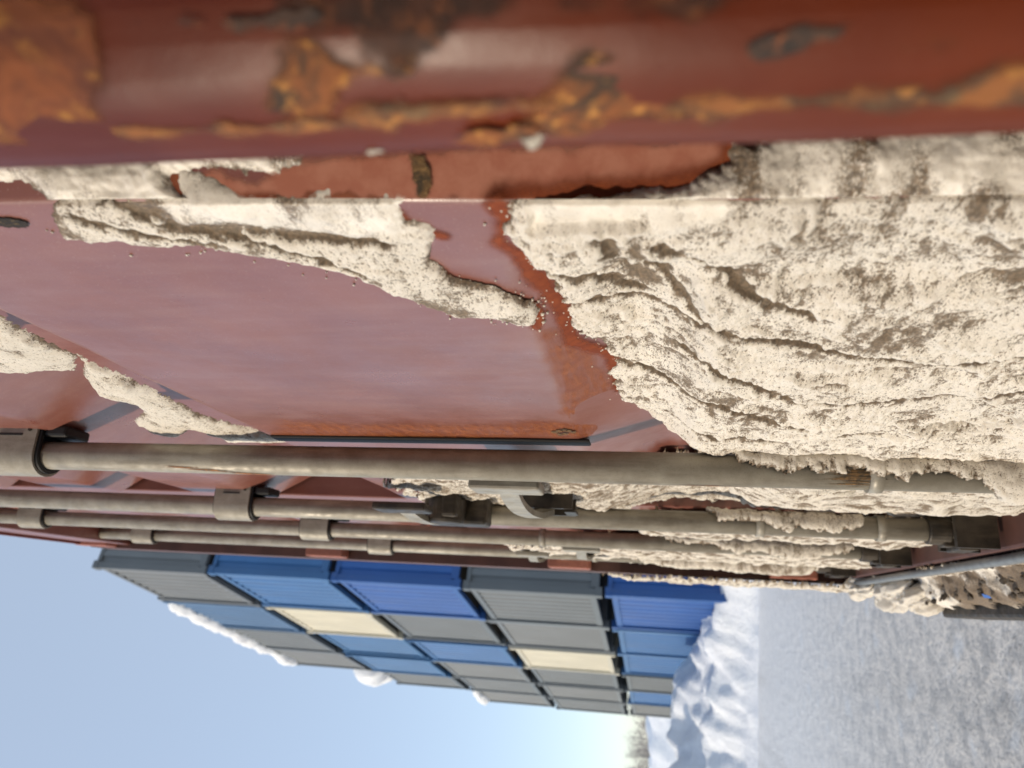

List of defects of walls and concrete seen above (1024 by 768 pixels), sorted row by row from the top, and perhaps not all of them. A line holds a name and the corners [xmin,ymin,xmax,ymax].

corrosion [0,0,100,143]
corrosion [114,126,194,139]
corrosion [204,0,1024,199]